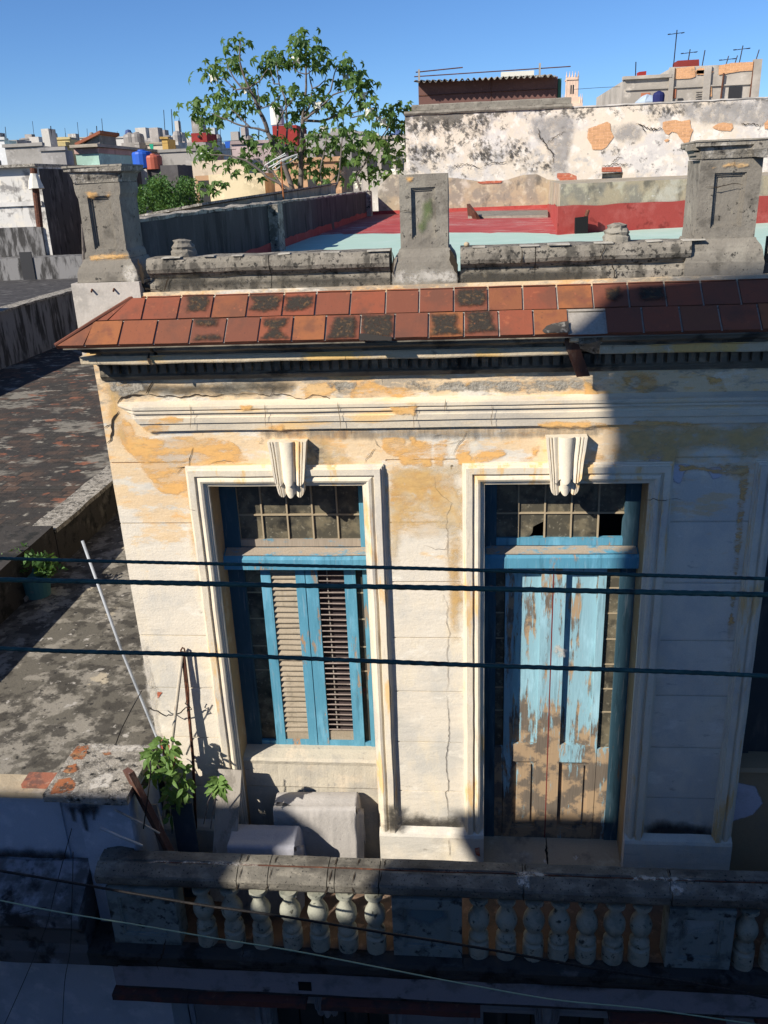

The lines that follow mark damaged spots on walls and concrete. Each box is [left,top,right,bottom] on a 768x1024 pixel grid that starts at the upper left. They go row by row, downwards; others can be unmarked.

damp [408,117,487,164]
damp [507,140,551,171]
flaking render [587,122,640,150]
flaking render [663,62,768,143]
peeling [108,380,245,495]
peeling [382,437,505,550]